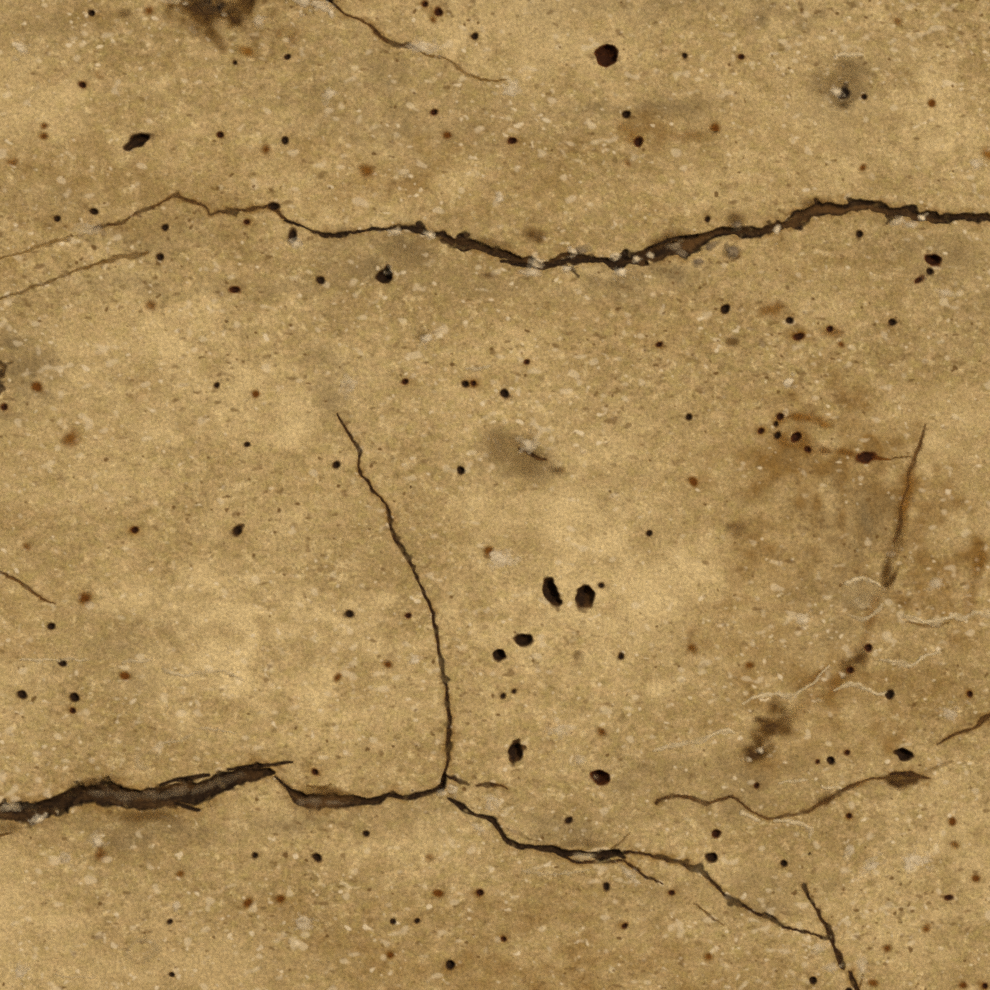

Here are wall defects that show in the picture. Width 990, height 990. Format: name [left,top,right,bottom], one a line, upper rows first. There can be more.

crack [295,0,507,82]
crack [0,239,59,259]
crack [92,194,990,277]
crack [0,413,890,990]